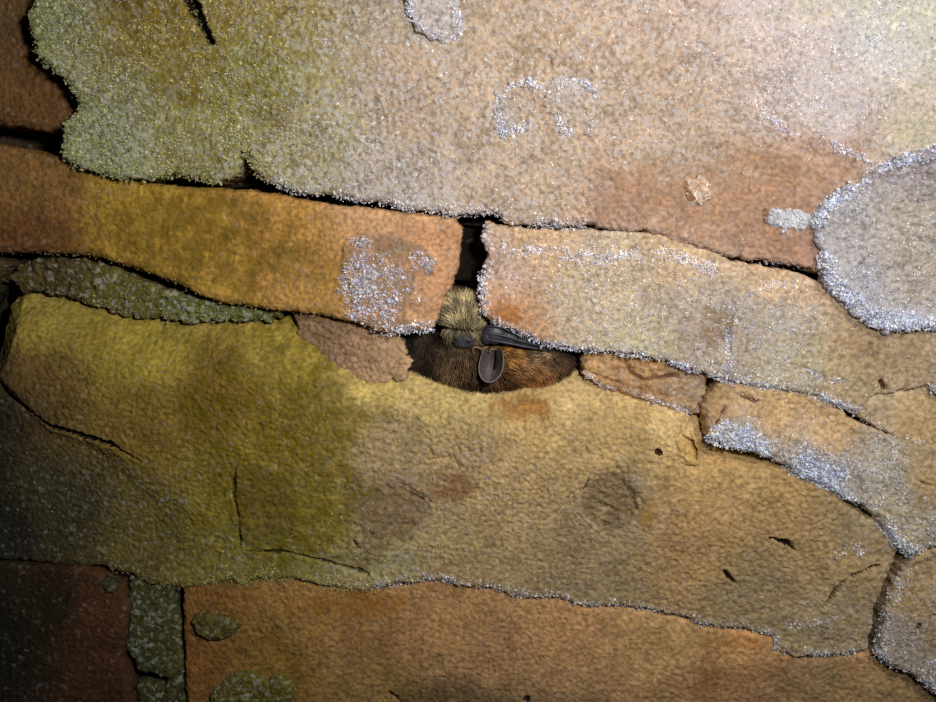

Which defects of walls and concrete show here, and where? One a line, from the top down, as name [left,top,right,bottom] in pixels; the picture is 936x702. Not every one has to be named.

crack [183,0,215,45]
crack [0,253,195,293]
crack [0,381,133,456]